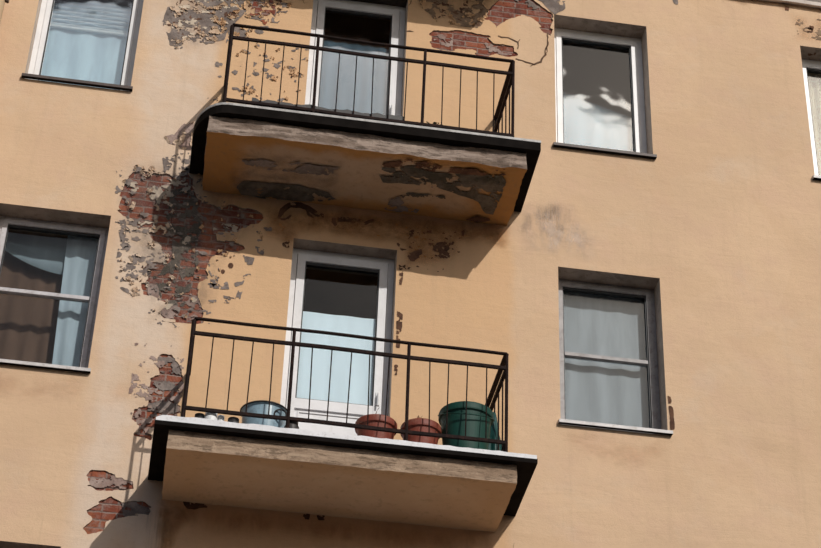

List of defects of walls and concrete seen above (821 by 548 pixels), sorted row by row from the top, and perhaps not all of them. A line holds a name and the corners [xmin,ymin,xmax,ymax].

peeling [163,0,309,101]
peeling [419,0,518,55]
flaking render [533,0,565,36]
peeling [795,19,821,40]
peeling [115,122,272,327]
peeling [237,181,374,226]
peeling [129,345,184,437]